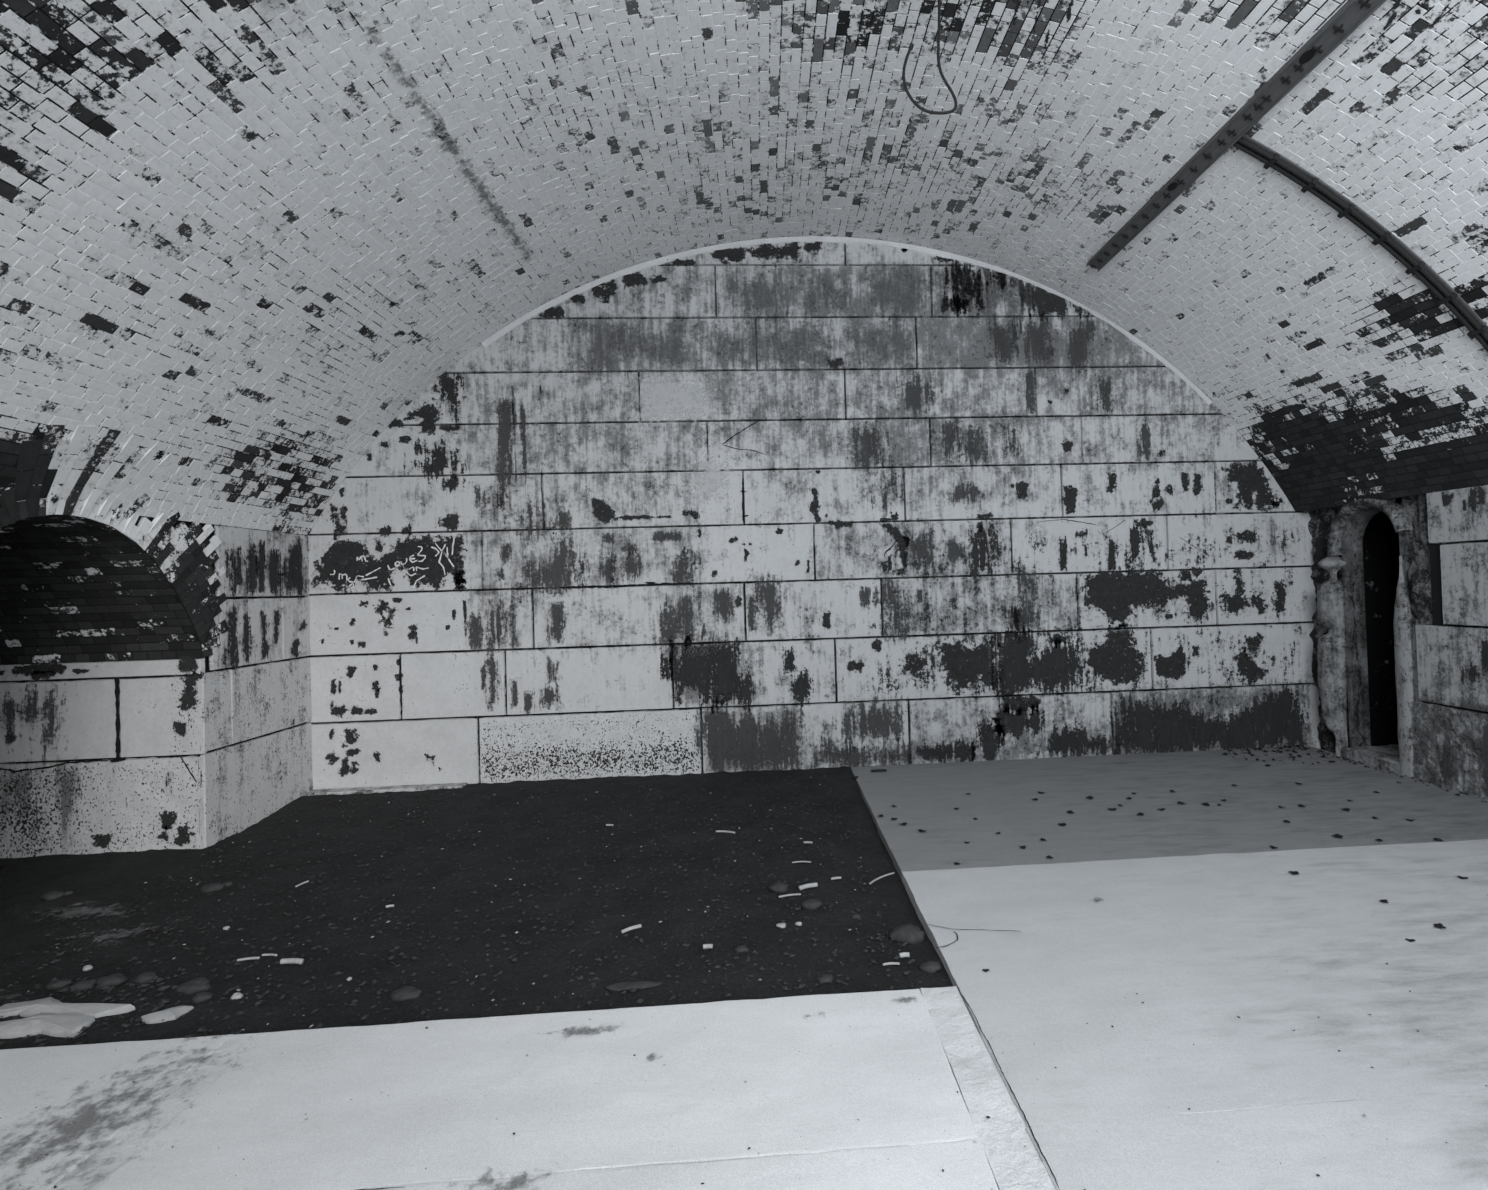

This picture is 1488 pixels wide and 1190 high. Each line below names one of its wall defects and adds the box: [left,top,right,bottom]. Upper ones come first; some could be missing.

peeling [1374,290,1442,334]
water stain [495,383,527,506]
water stain [1439,486,1486,513]
water stain [464,583,567,715]
water stain [652,573,785,650]
water stain [859,520,1045,645]
water stain [1461,638,1488,686]
water stain [0,678,75,837]
water stain [691,680,1311,772]